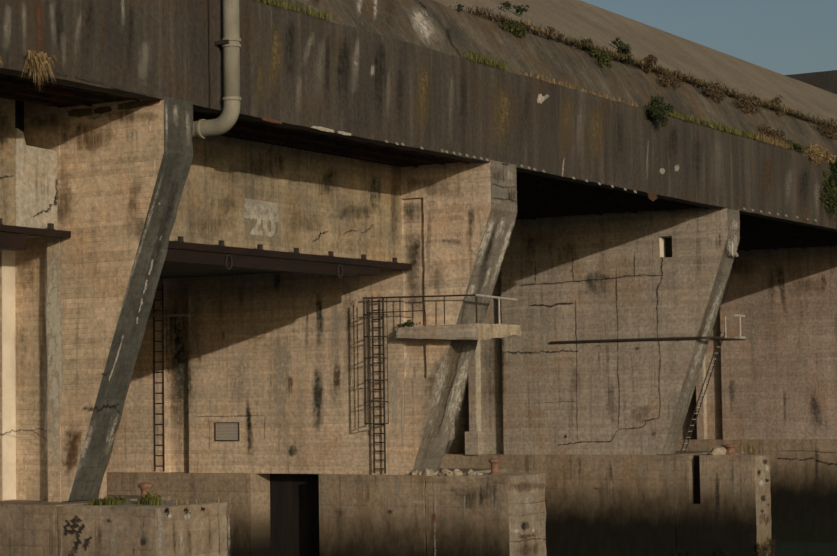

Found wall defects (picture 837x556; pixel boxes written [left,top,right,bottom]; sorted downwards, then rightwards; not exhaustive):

crack [33,179,58,218]
damp [317,300,340,372]
crack [504,254,663,446]
damp [314,373,322,423]
crack [0,428,51,440]
corrosion [63,432,78,470]
crack [777,454,837,473]